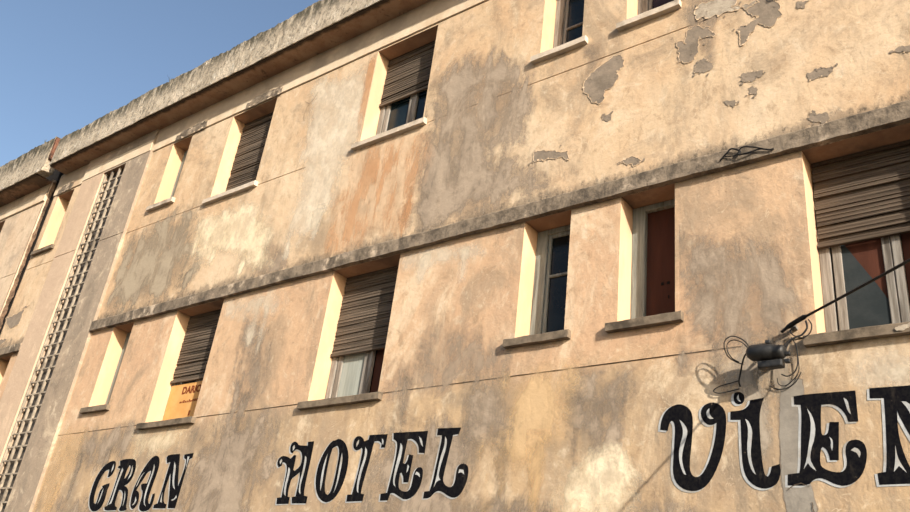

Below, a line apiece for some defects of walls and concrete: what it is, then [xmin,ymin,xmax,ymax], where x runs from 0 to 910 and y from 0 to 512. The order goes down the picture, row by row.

peeling [582,54,625,121]
peeling [672,0,783,77]
peeling [723,70,766,107]
peeling [807,63,838,81]
peeling [890,44,910,53]
damp [410,49,551,231]
peeling [529,145,570,165]
peeling [618,155,645,168]
damp [679,235,802,451]
damp [337,333,538,512]
damp [560,371,692,512]